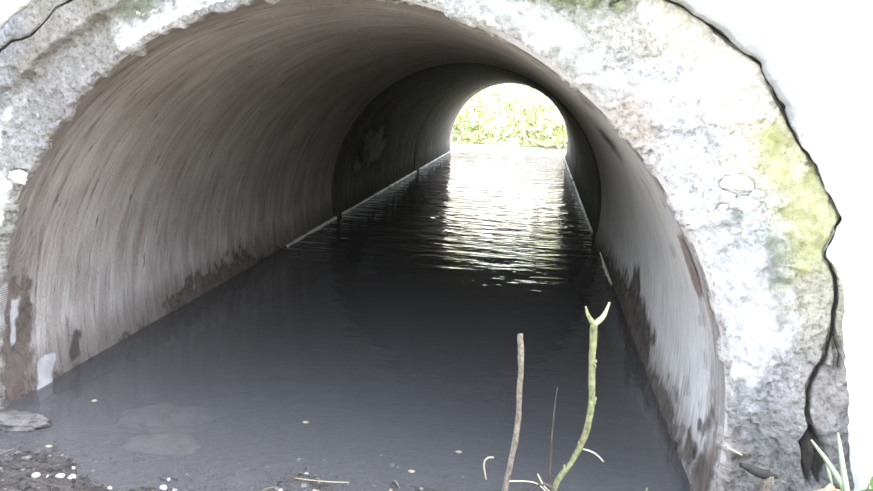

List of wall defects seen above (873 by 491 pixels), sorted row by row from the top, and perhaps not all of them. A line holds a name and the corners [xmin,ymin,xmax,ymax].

crack [0,0,73,52]
rust [677,233,702,297]
crack [667,0,842,482]